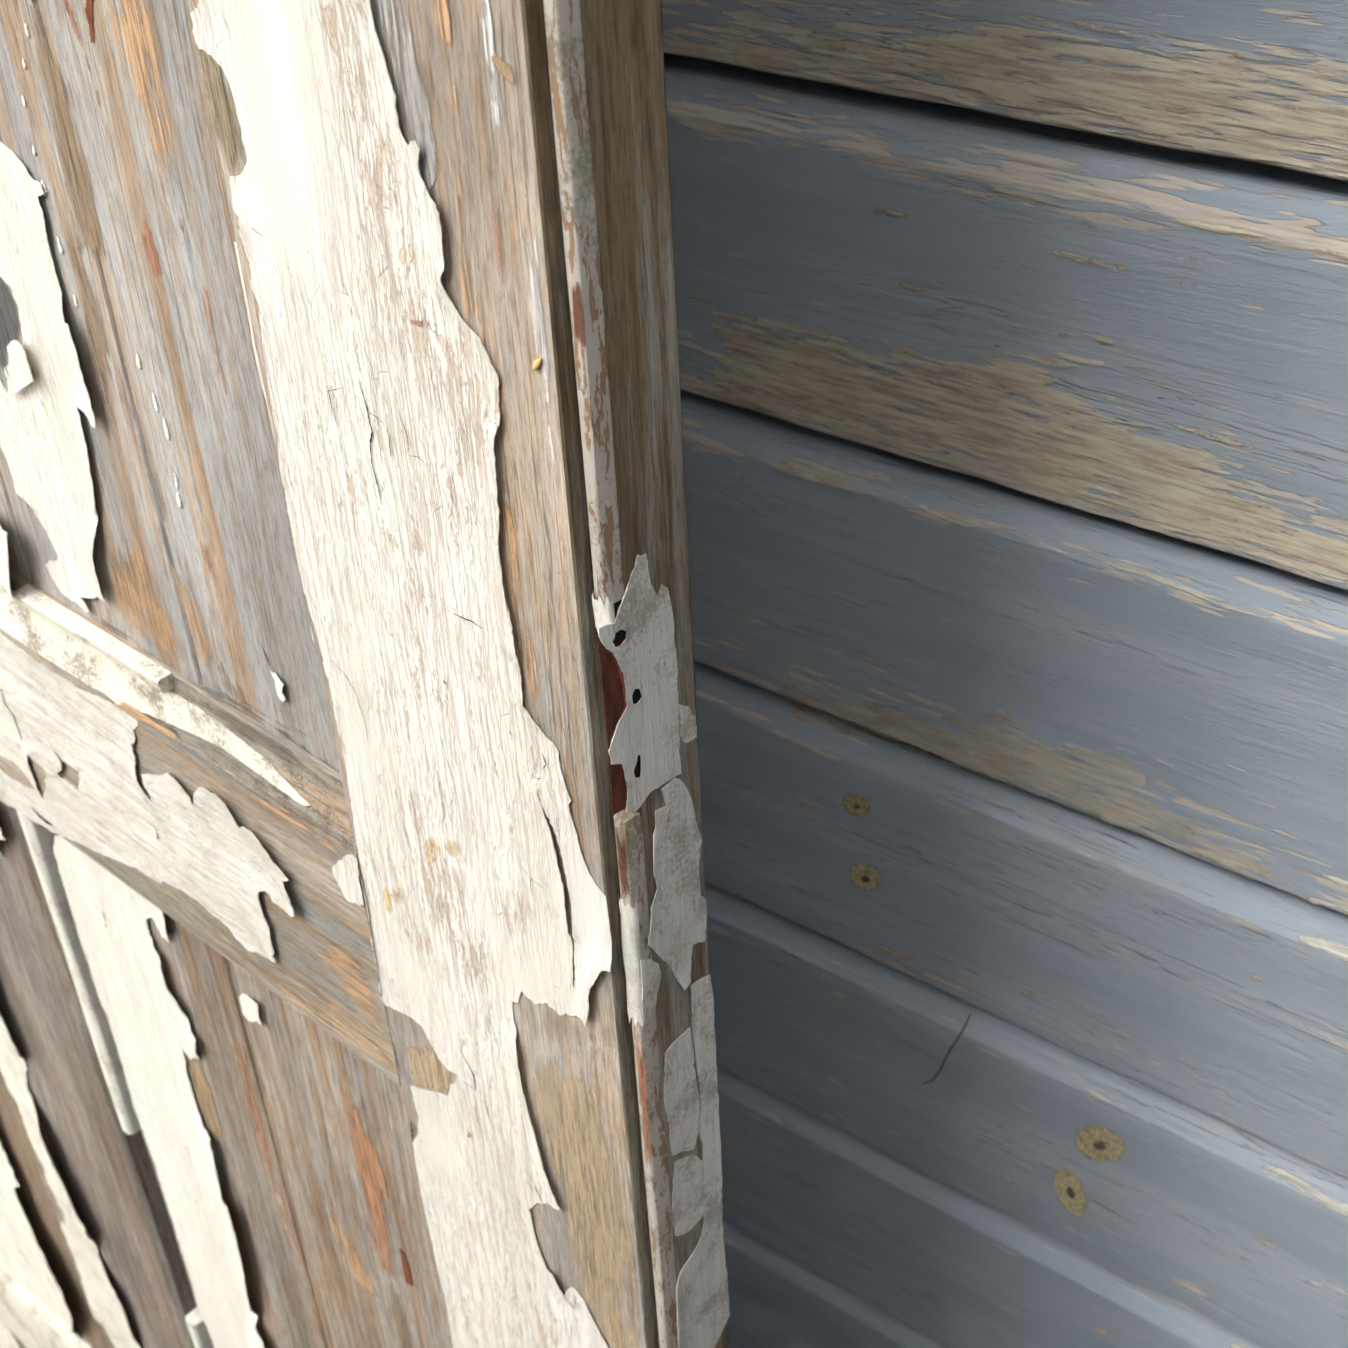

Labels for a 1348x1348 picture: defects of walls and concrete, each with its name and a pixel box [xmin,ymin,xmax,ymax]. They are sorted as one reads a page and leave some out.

corrosion [85,0,94,43]
peeling [0,142,105,612]
peeling [152,393,170,441]
peeling [173,472,183,508]
peeling [190,0,730,1348]
peeling [0,526,310,1348]